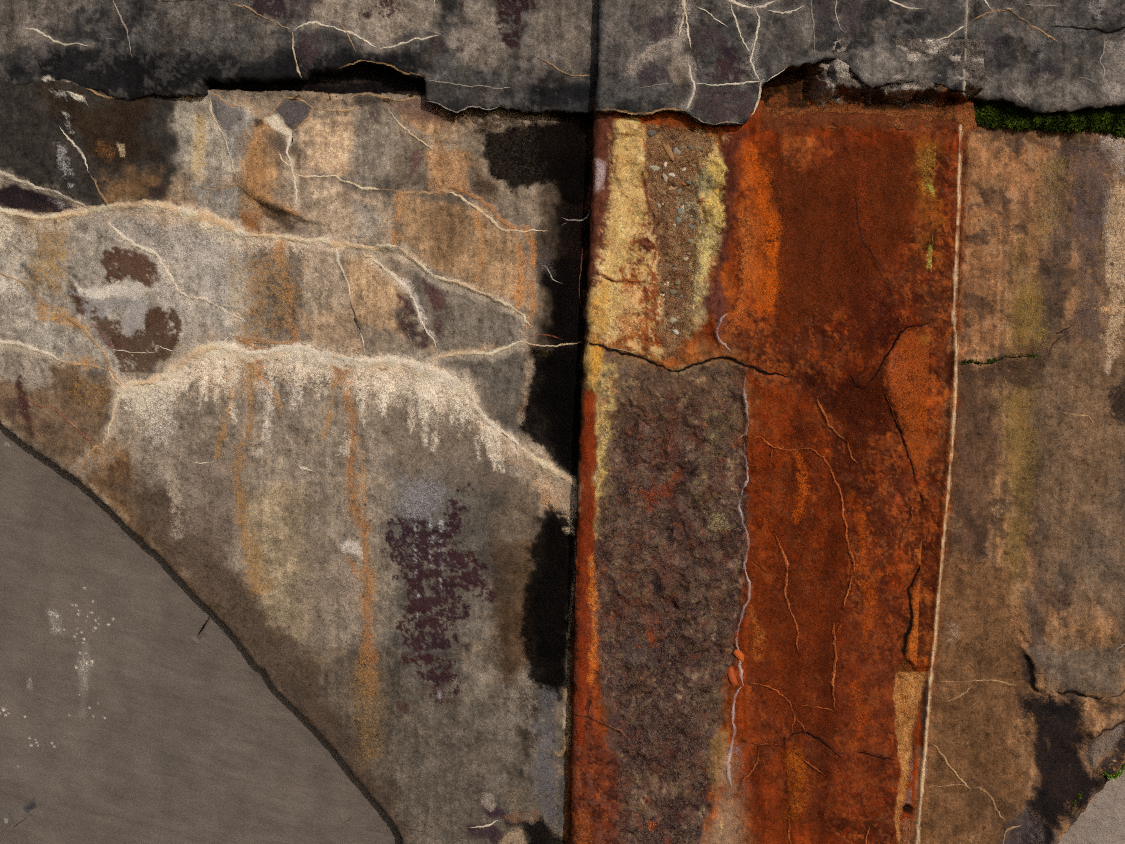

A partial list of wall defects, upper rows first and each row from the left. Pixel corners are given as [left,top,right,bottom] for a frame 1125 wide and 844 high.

water stain [57,81,83,134]
crack [223,0,590,232]
crack [602,0,841,124]
crack [928,0,1125,82]
water stain [701,158,726,275]
water stain [0,112,647,844]
crack [0,94,894,786]
corrosion [891,330,930,474]
corrosion [576,392,600,744]
crack [902,566,920,657]
corrosion [907,543,922,668]
crack [941,654,1125,736]